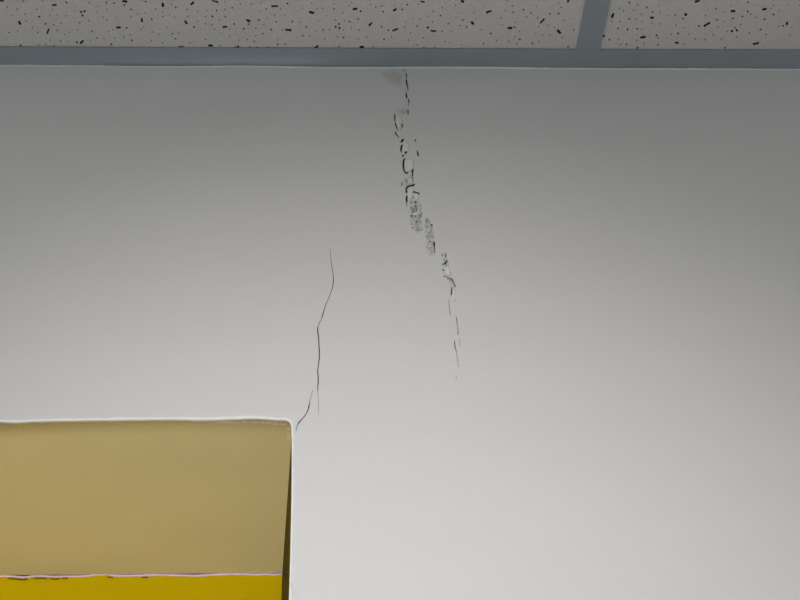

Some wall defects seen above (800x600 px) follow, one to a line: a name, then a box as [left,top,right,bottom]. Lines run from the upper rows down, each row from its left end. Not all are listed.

crack [394,69,420,206]
crack [296,249,334,430]
crack [426,219,461,380]